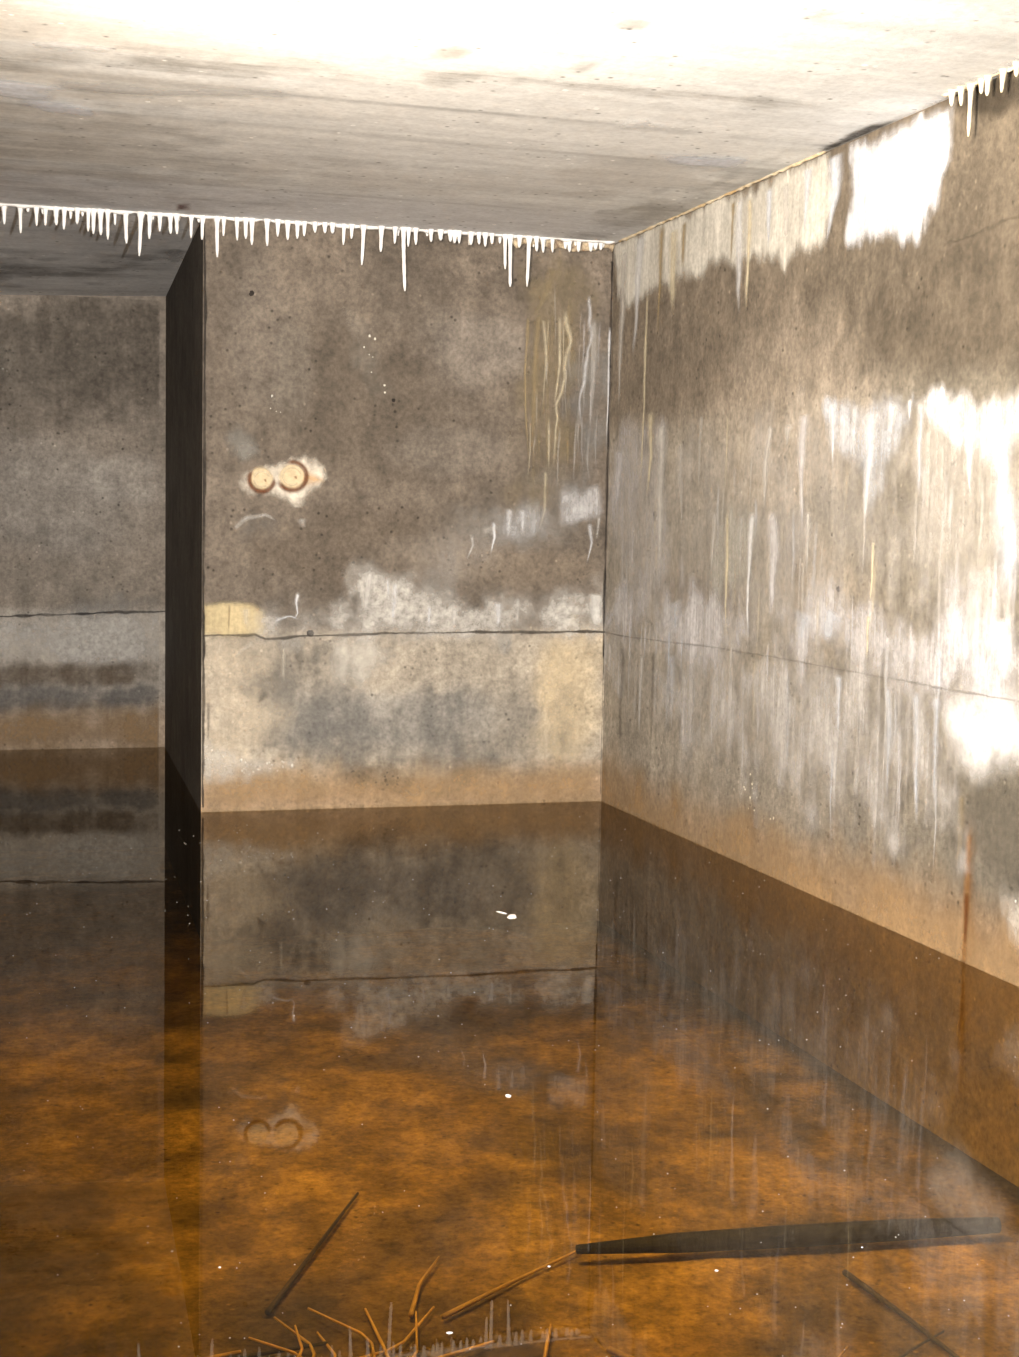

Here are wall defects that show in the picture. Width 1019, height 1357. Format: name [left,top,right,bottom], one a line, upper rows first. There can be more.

water stain [942,67,1019,111]
water stain [0,203,86,213]
water stain [104,115,949,559]
rust [246,459,324,504]
water stain [335,573,518,679]
water stain [543,596,600,635]
water stain [617,510,754,743]
water stain [714,664,801,769]
water stain [798,545,1019,791]
water stain [708,773,834,905]
water stain [855,885,1019,987]